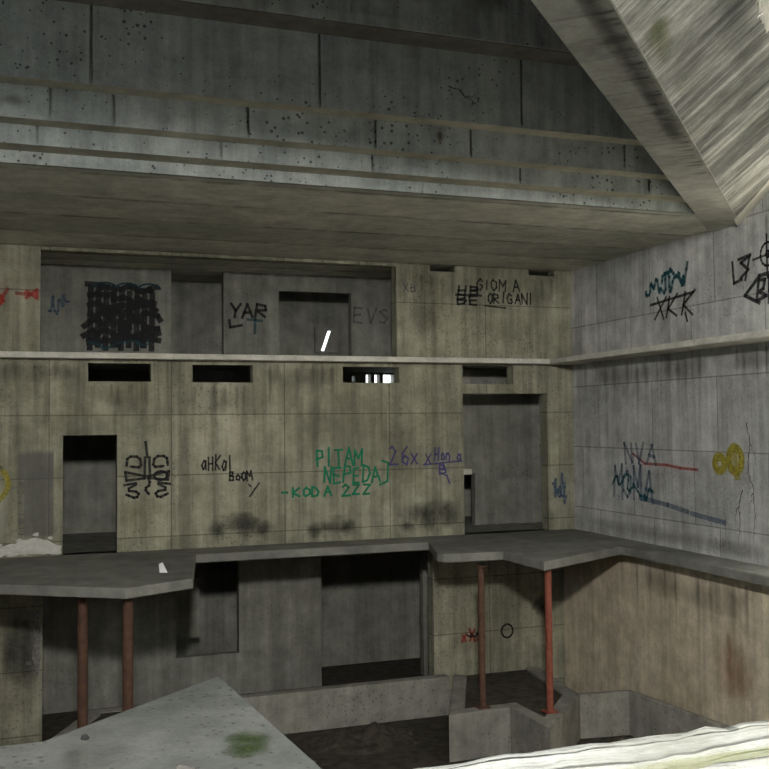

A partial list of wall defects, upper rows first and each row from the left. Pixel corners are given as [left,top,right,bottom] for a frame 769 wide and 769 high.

peeling [0,532,61,557]